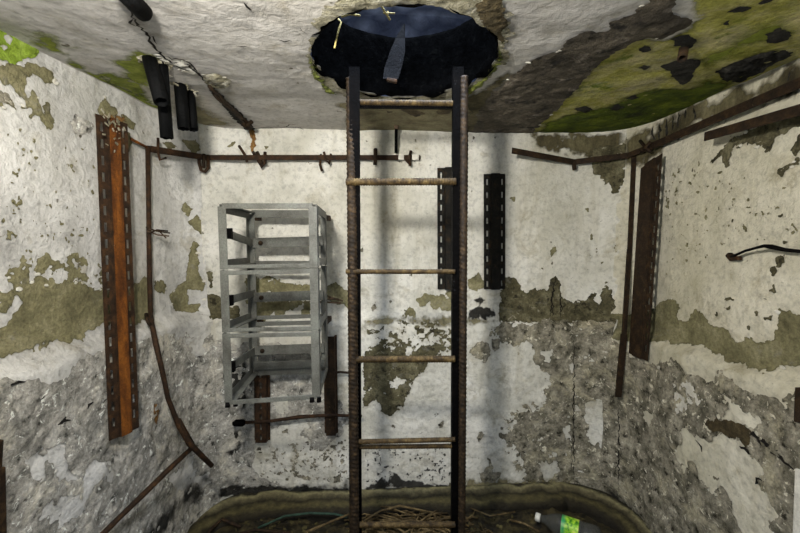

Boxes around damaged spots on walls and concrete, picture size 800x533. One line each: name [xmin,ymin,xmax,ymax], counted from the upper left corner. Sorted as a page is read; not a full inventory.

water stain [723,0,773,25]
peeling [592,143,627,194]
water stain [532,63,800,166]
peeling [0,249,111,358]
peeling [0,330,349,533]
peeling [129,202,310,325]
peeling [362,290,451,416]
crack [550,277,563,317]
crack [569,341,577,484]
crack [615,401,623,484]
peeling [469,276,800,533]
peeling [763,255,785,300]